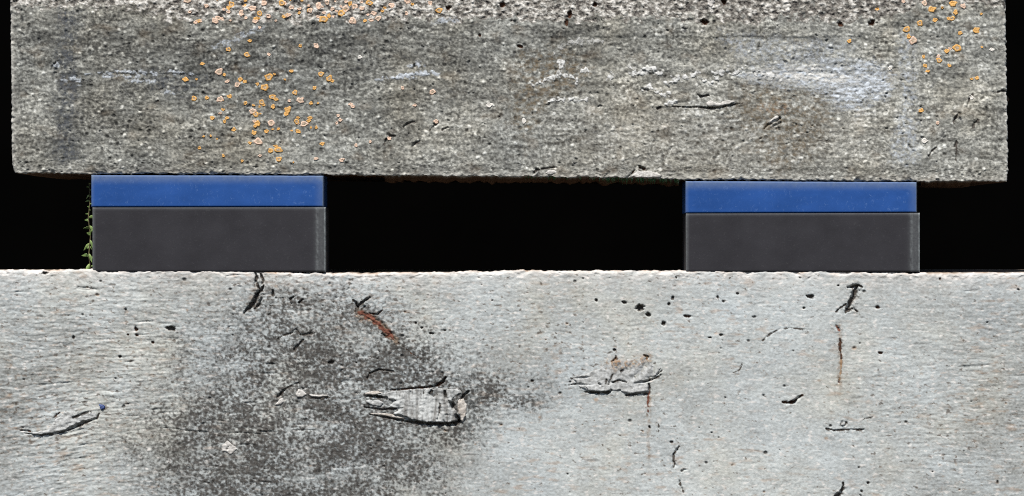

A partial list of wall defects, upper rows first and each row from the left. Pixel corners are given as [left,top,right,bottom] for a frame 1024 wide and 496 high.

crack [643,88,743,110]
crack [243,272,303,314]
crack [835,284,863,313]
corrosion [352,298,417,357]
damp [122,288,538,496]
spalling [364,369,469,426]
spalling [570,354,662,412]